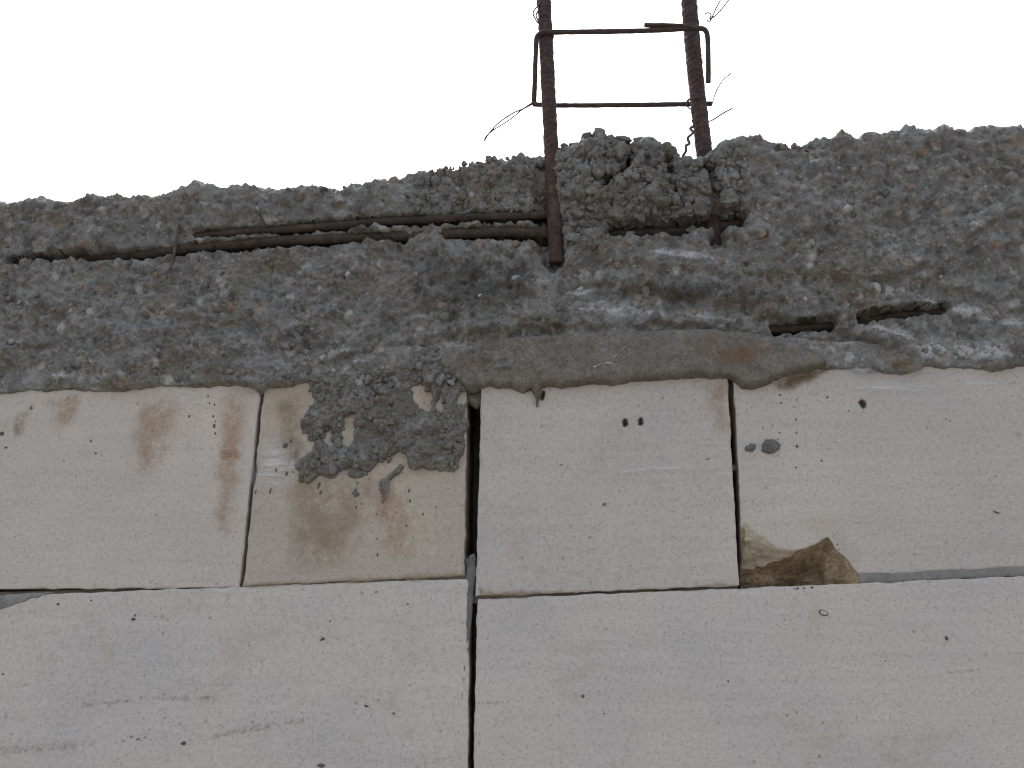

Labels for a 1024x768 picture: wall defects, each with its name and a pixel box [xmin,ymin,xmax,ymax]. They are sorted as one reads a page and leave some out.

spalling [0,179,554,387]
spalling [500,218,741,321]
spalling [720,133,1024,354]
peeling [348,468,368,509]
peeling [376,464,404,515]
spalling [740,524,860,590]